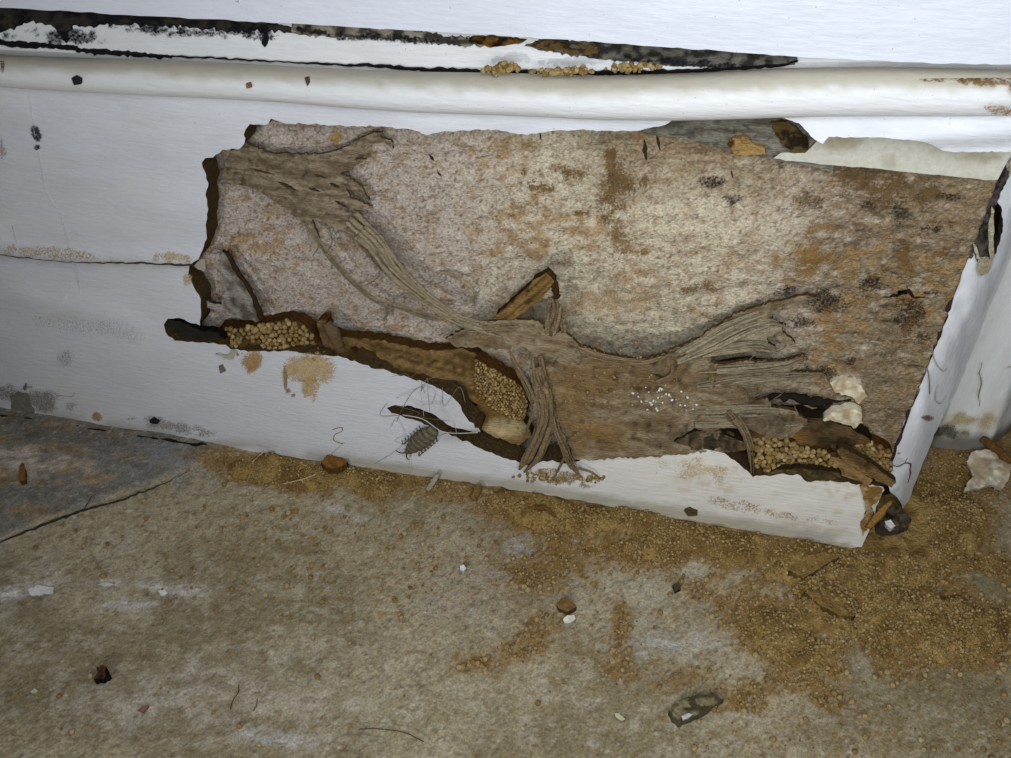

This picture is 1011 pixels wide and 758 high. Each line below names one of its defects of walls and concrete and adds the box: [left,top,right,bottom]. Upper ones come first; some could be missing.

peeling [525,39,798,68]
peeling [969,159,1011,276]
crack [76,425,207,447]
crack [0,470,189,543]